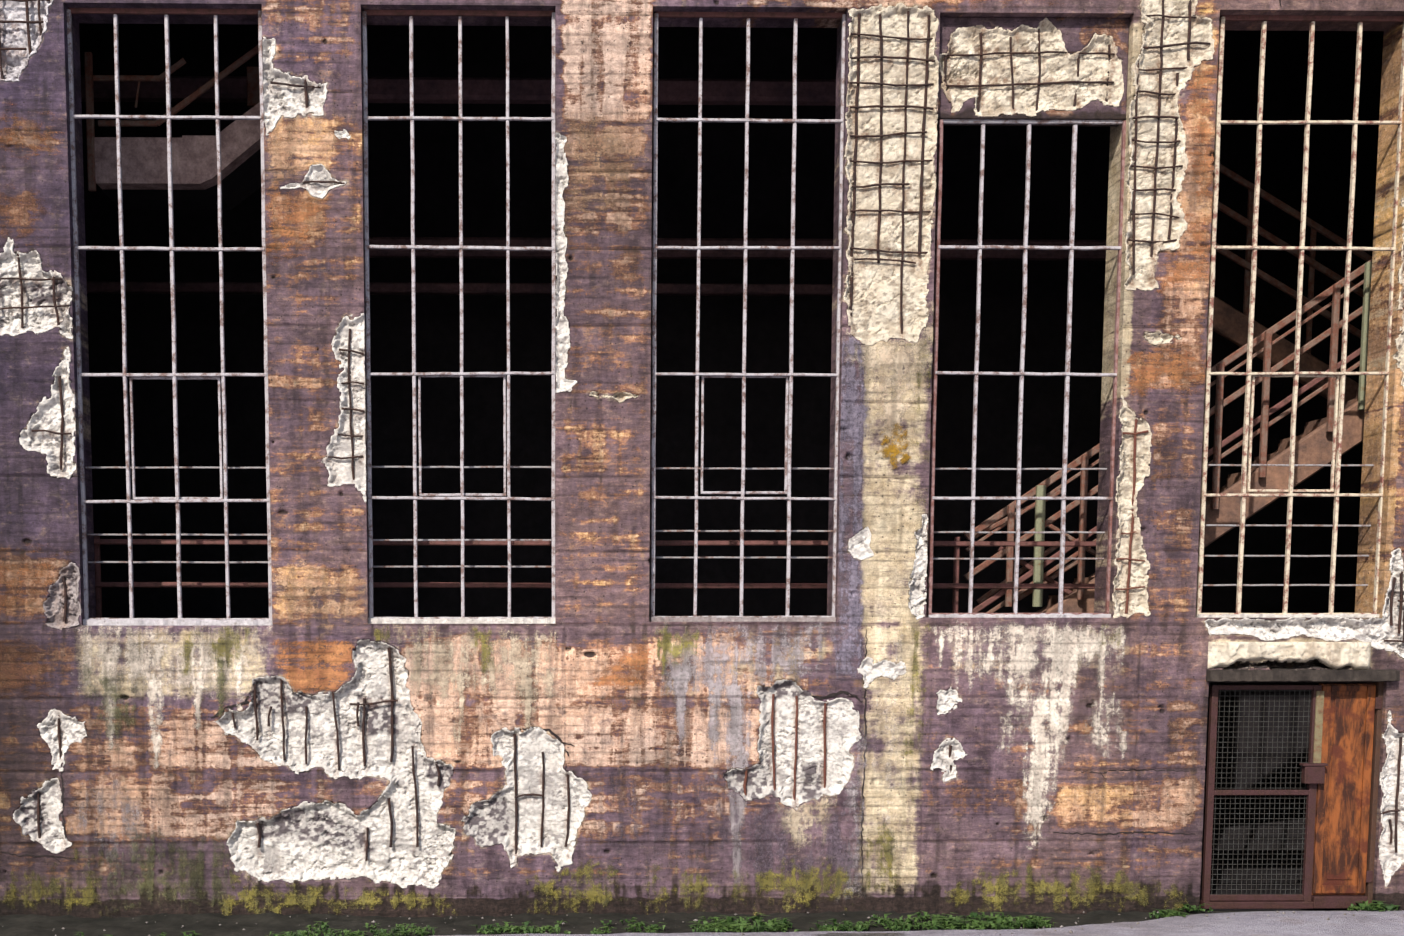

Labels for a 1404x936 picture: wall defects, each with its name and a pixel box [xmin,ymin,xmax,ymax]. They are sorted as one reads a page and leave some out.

spalling [0,0,53,82]
spalling [843,0,1215,346]
spalling [0,237,77,479]
spalling [321,313,367,502]
spalling [13,709,87,854]
leakage [81,626,271,768]
spalling [214,639,592,889]
spalling [723,679,862,811]
leakage [930,623,1127,849]
spalling [1223,659,1351,670]
spalling [1204,548,1404,658]
spalling [1378,710,1404,887]